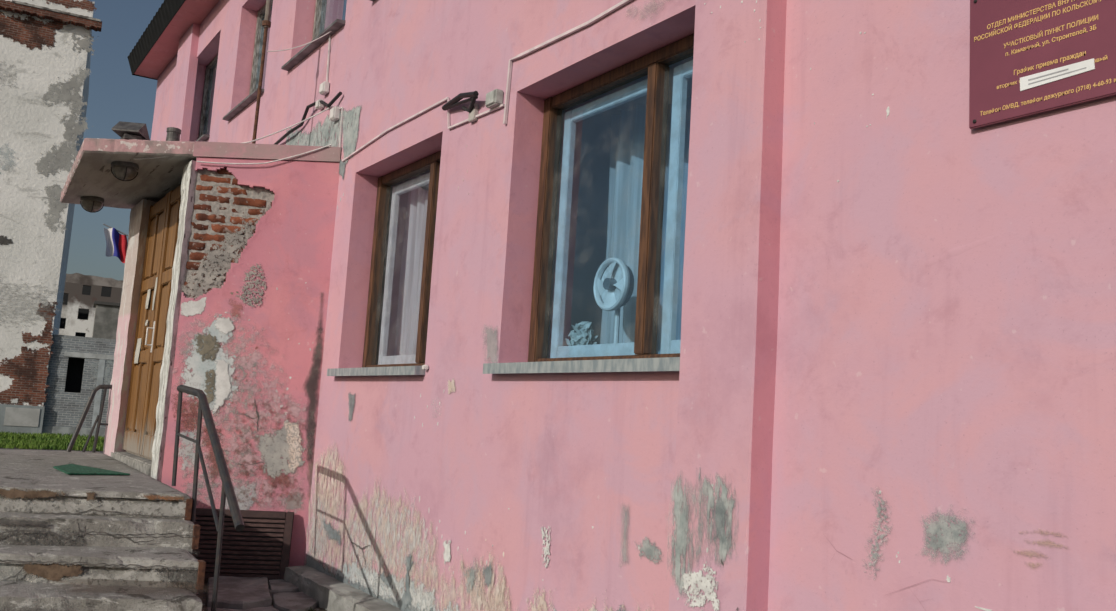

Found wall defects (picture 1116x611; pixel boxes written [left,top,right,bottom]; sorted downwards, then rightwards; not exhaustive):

flaking render [0,11,99,55]
flaking render [47,0,97,12]
flaking render [36,67,91,233]
peeling [286,106,361,179]
peeling [0,157,510,611]
leakage [305,329,322,497]
peeling [638,474,735,611]
peeling [923,514,968,583]